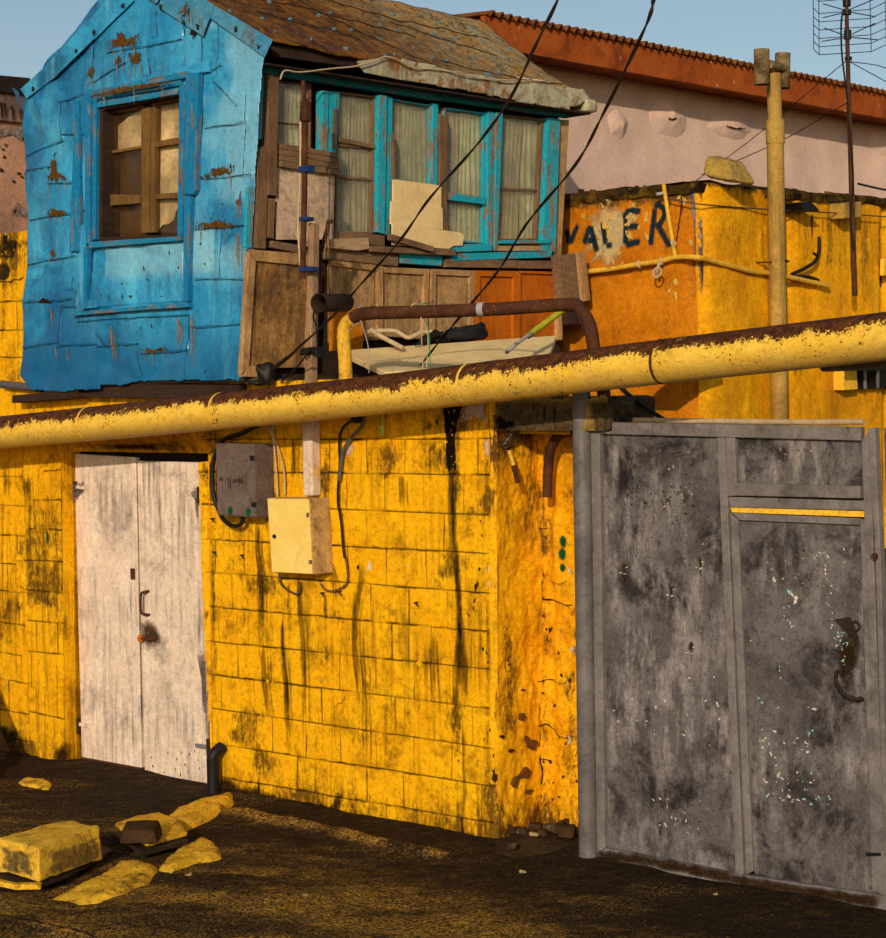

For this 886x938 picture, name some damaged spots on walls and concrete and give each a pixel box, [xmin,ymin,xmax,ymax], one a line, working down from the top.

rust [85,32,174,101]
rust [47,152,70,194]
rust [204,163,234,186]
water stain [0,237,27,280]
rust [195,191,242,270]
peeling [569,189,660,265]
water stain [443,406,466,691]
water stain [352,580,362,652]
peeling [765,546,848,665]
water stain [281,625,289,725]
peeling [510,736,578,807]
spalling [759,729,831,805]